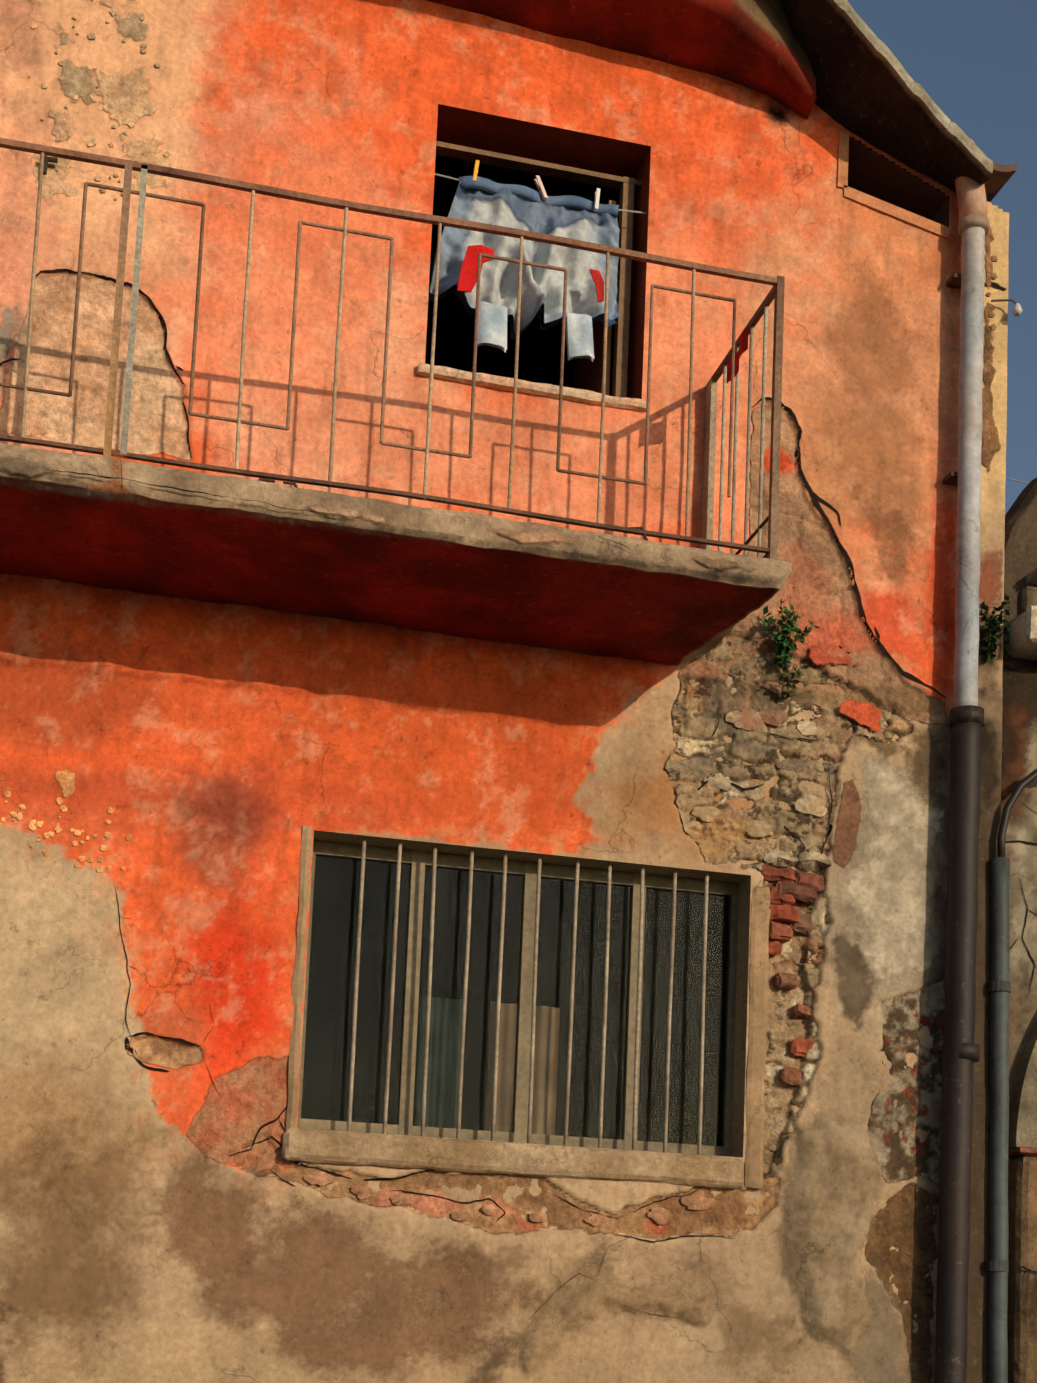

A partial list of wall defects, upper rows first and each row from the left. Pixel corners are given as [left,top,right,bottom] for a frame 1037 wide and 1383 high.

peeling [29,0,171,205]
peeling [0,272,192,460]
spalling [0,456,53,477]
crack [752,397,947,699]
peeling [0,770,132,873]
crack [114,884,138,1040]
flaking render [187,401,947,1383]
damp [834,936,875,1028]
crack [1006,802,1037,845]
crack [1010,878,1037,993]
damp [0,1133,130,1345]
damp [163,1155,552,1383]